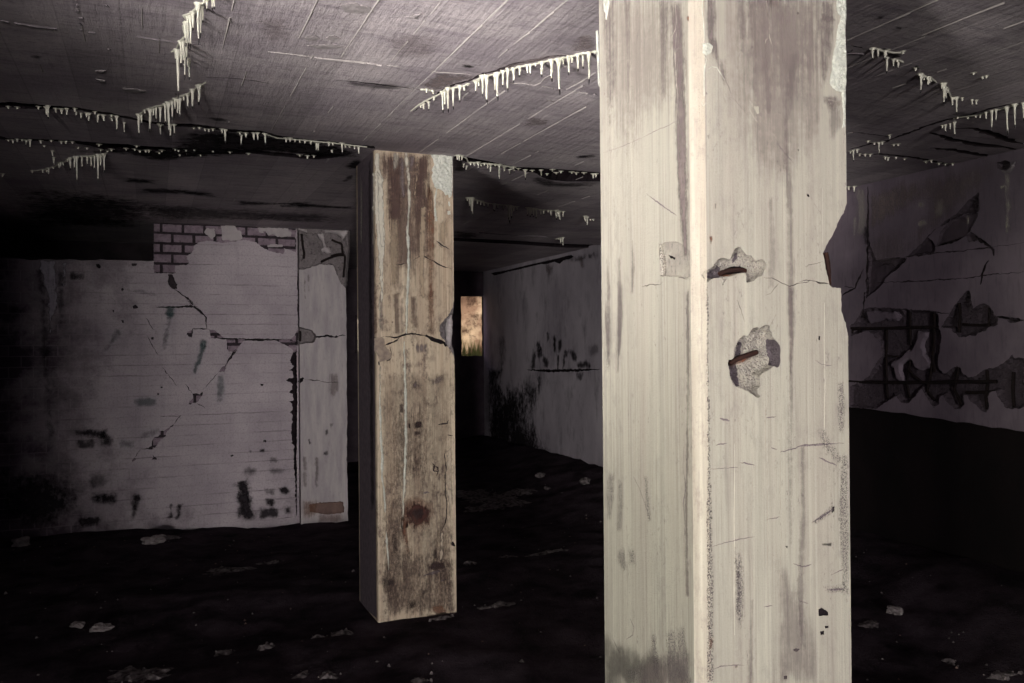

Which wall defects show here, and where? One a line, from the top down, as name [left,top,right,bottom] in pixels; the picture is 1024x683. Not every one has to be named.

water stain [268,51,399,67]
water stain [411,31,600,111]
flaking render [153,222,350,288]
spalling [659,241,767,365]
spalling [816,252,832,287]
spalling [848,192,1024,412]
crack [374,333,446,358]
spalling [728,325,781,398]
crack [157,274,345,516]
water stain [75,430,106,448]
water stain [237,470,290,520]
corrosion [402,503,429,544]